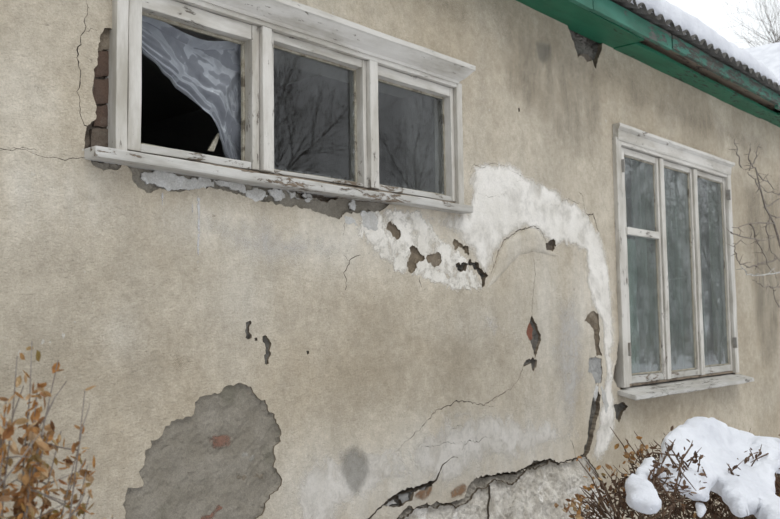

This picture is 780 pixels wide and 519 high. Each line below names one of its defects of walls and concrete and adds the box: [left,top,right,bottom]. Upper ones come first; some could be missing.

crack [77,5,92,127]
flaking render [84,28,111,149]
flaking render [569,29,602,68]
flaking render [91,161,401,240]
flaking render [407,245,442,273]
flaking render [453,239,488,288]
crack [491,226,544,273]
flaking render [245,321,271,365]
flaking render [123,383,282,519]
crack [368,369,523,519]
flaking render [382,311,615,519]
crack [479,440,584,516]